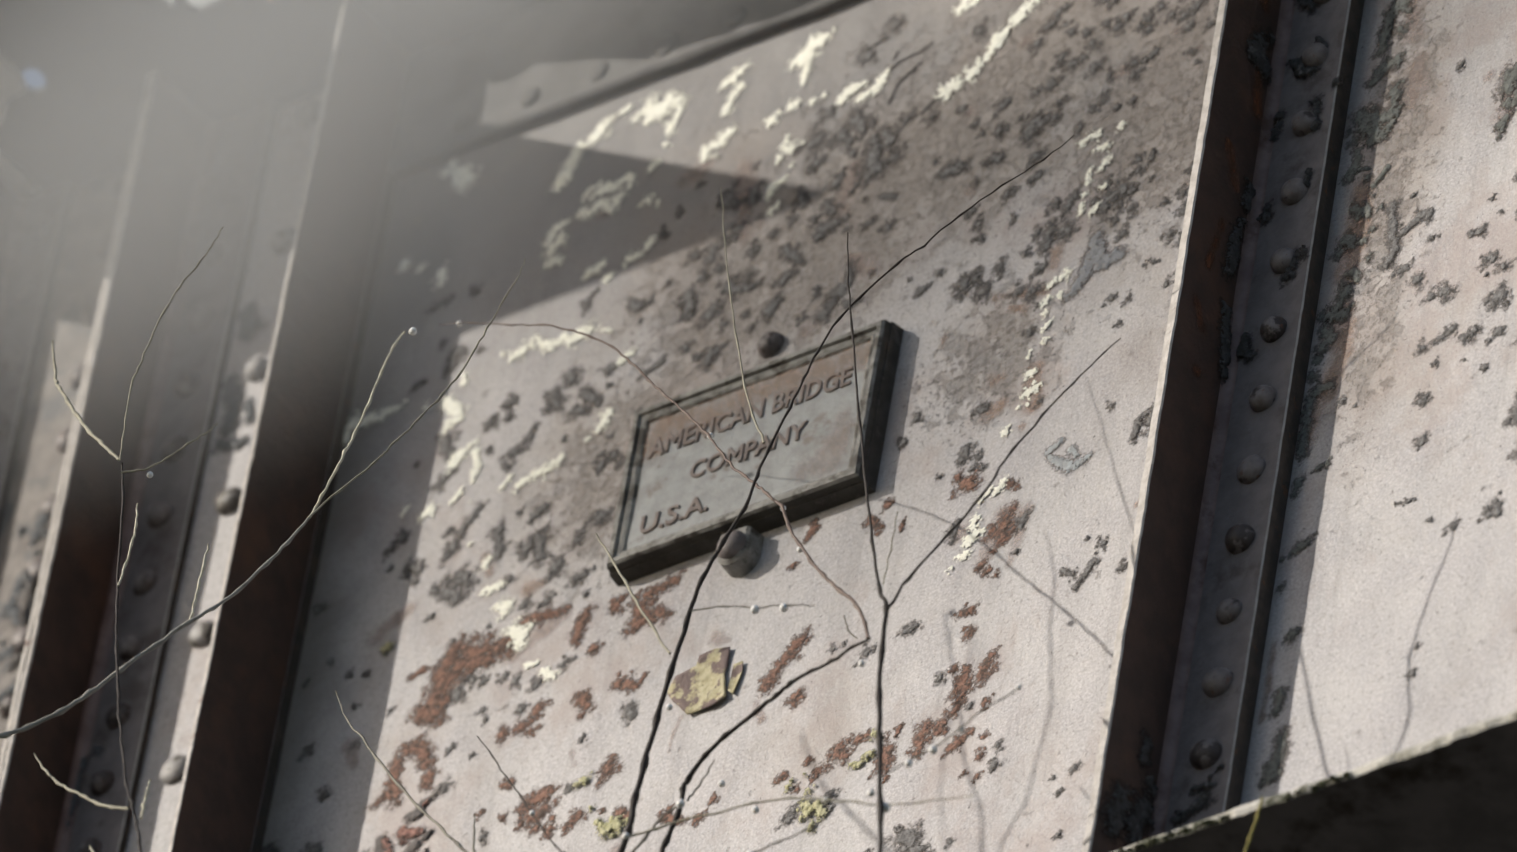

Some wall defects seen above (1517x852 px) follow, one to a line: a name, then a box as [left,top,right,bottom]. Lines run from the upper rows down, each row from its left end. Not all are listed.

peeling [698,60,753,164]
peeling [760,26,891,218]
peeling [932,0,1043,104]
peeling [999,120,1129,439]
peeling [343,371,484,525]
corrosion [948,468,984,500]
corrosion [973,477,1022,579]
peeling [467,541,561,682]
corrosion [365,569,687,811]
corrosion [757,625,813,710]
corrosion [773,644,1002,795]
corrosion [952,602,980,644]